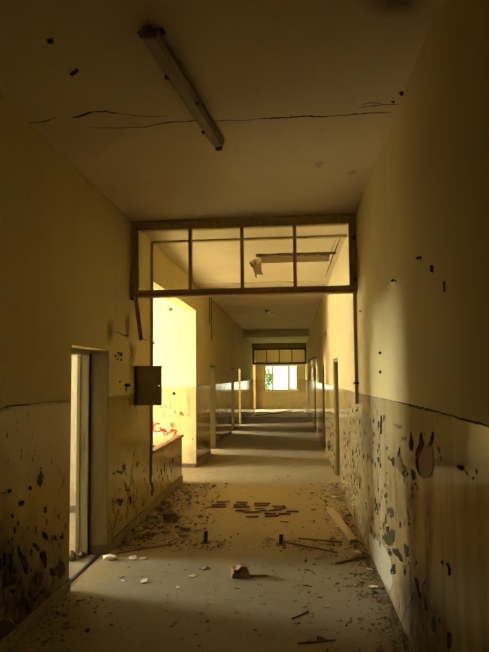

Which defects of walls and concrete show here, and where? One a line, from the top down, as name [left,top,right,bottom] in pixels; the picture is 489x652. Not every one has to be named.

crack [34,111,196,128]
crack [214,102,397,122]
peeling [249,258,263,278]
crack [0,400,65,409]
crack [370,396,489,427]
peeling [112,462,154,512]
flaking render [343,405,442,632]
peeling [4,514,65,586]